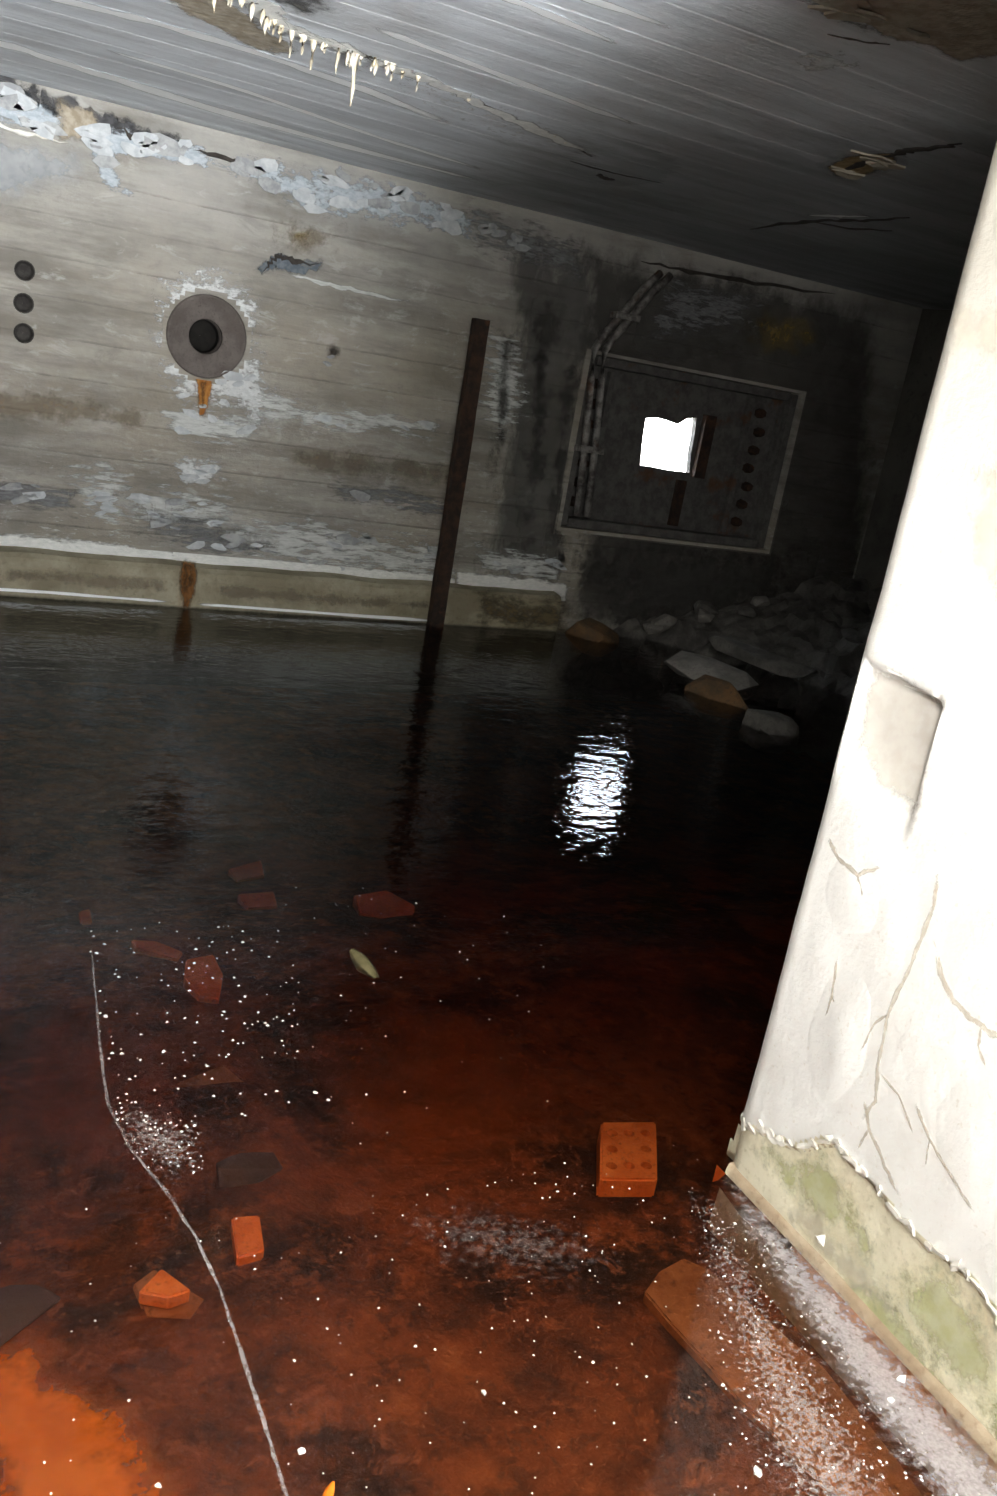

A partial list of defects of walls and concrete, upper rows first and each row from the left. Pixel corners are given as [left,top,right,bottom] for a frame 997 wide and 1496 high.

peeling [807,0,997,61]
peeling [0,82,476,240]
corrosion [196,379,212,415]
corrosion [179,561,197,607]
peeling [727,1111,997,1440]